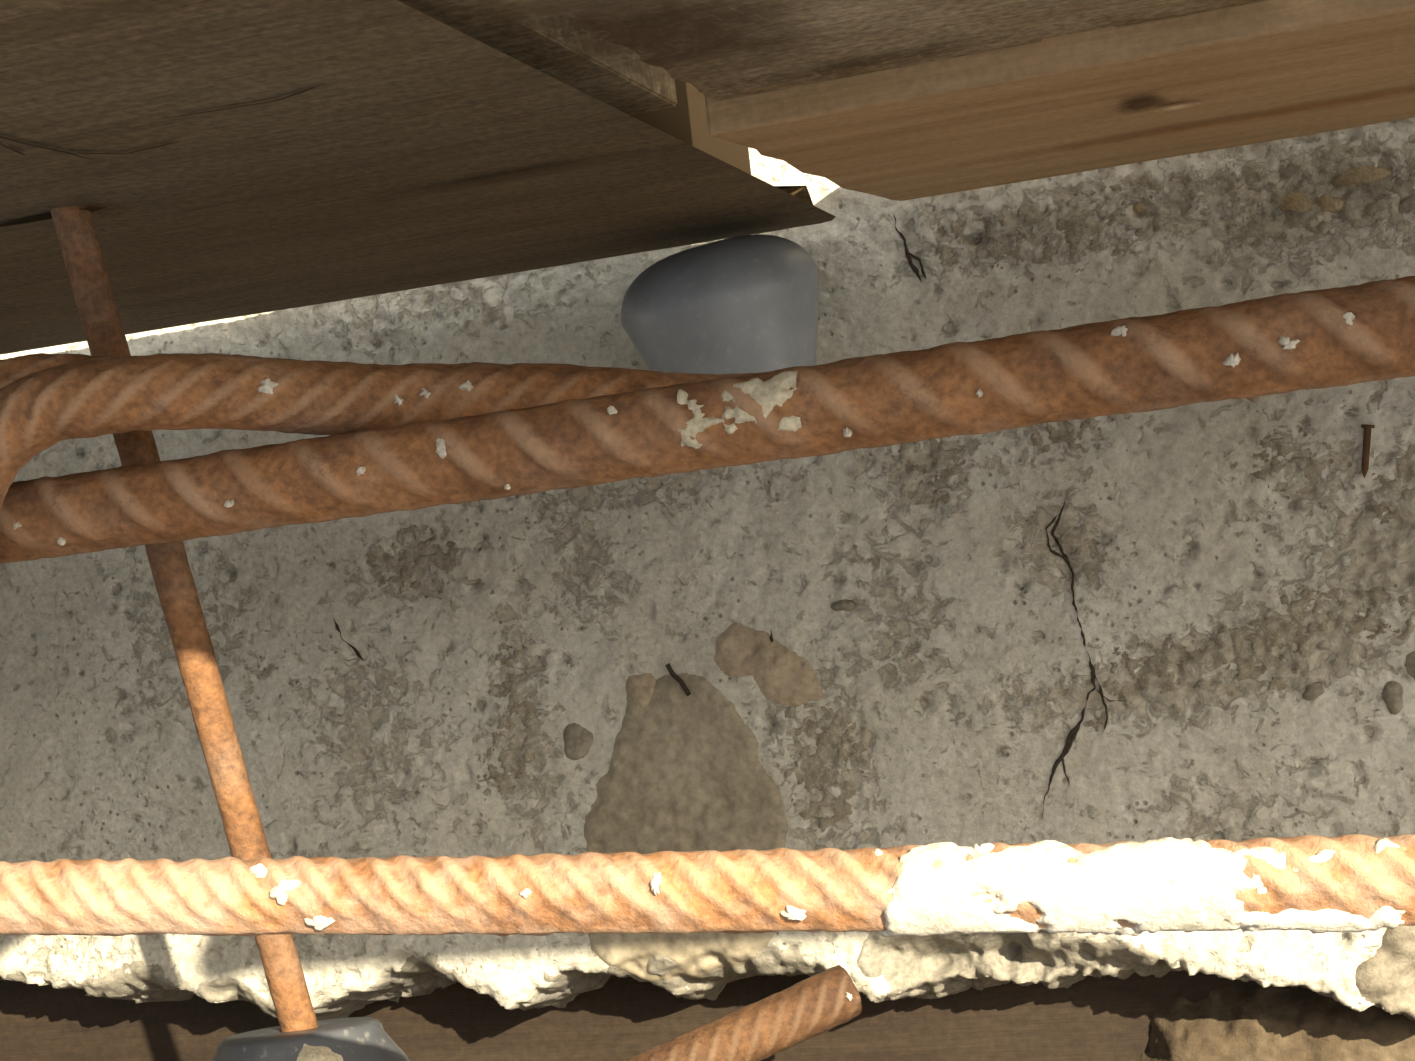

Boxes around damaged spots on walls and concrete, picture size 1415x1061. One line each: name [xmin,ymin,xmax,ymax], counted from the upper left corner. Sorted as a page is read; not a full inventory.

crack [1042,491,1127,815]
peeling [584,621,826,854]
spalling [3,973,26,982]
spalling [45,961,278,1018]
spalling [315,1008,356,1020]
spalling [399,952,481,994]
peeling [543,932,825,1001]
spalling [857,929,1181,999]
spalling [1355,925,1415,1021]